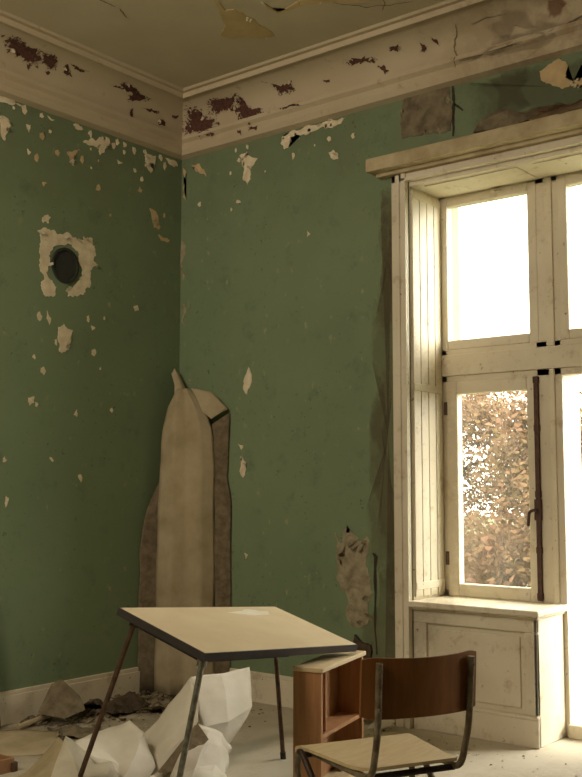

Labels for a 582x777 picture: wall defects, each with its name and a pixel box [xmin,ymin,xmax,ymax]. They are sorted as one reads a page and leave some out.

peeling [0,115,11,140]
peeling [0,96,27,114]
peeling [1,34,89,77]
peeling [114,82,264,137]
peeling [261,81,294,95]
peeling [281,118,344,160]
peeling [346,54,388,74]
peeling [539,59,582,89]
peeling [55,123,206,199]
peeling [235,145,258,185]
peeling [37,215,98,297]
peeling [37,312,73,353]